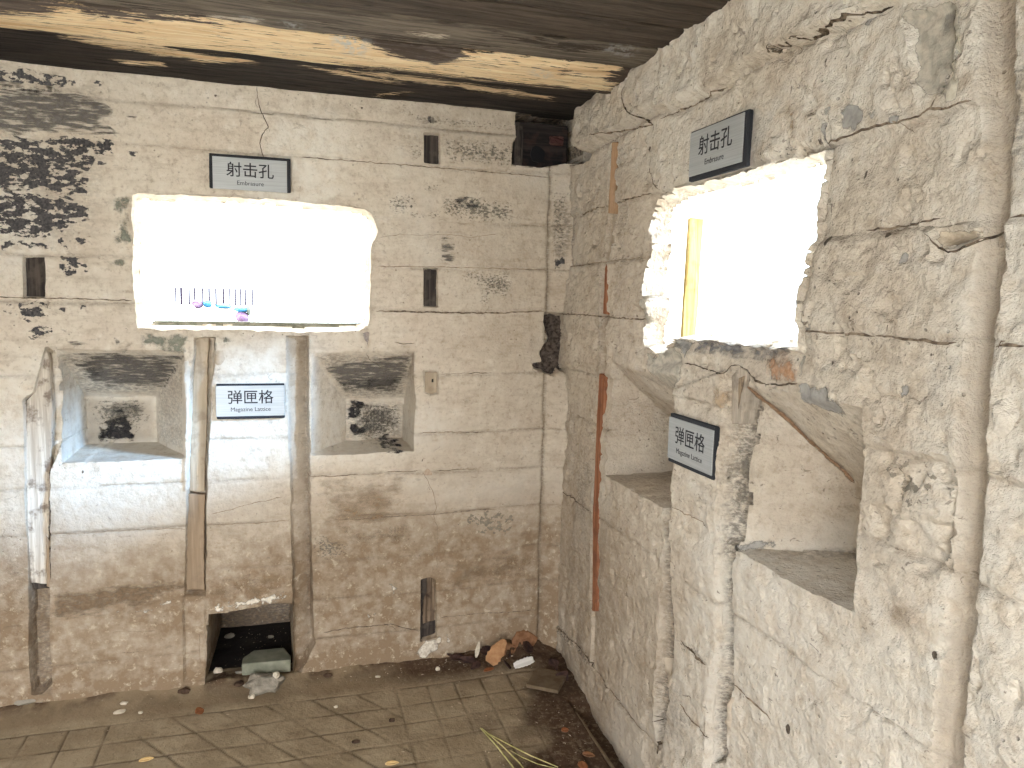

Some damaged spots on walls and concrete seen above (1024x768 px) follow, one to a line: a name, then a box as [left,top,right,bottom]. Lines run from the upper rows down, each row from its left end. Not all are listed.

crack [766,6,894,54]
crack [255,92,270,157]
mould [0,68,114,276]
mould [434,197,512,221]
crack [866,214,1024,253]
crack [685,363,797,386]